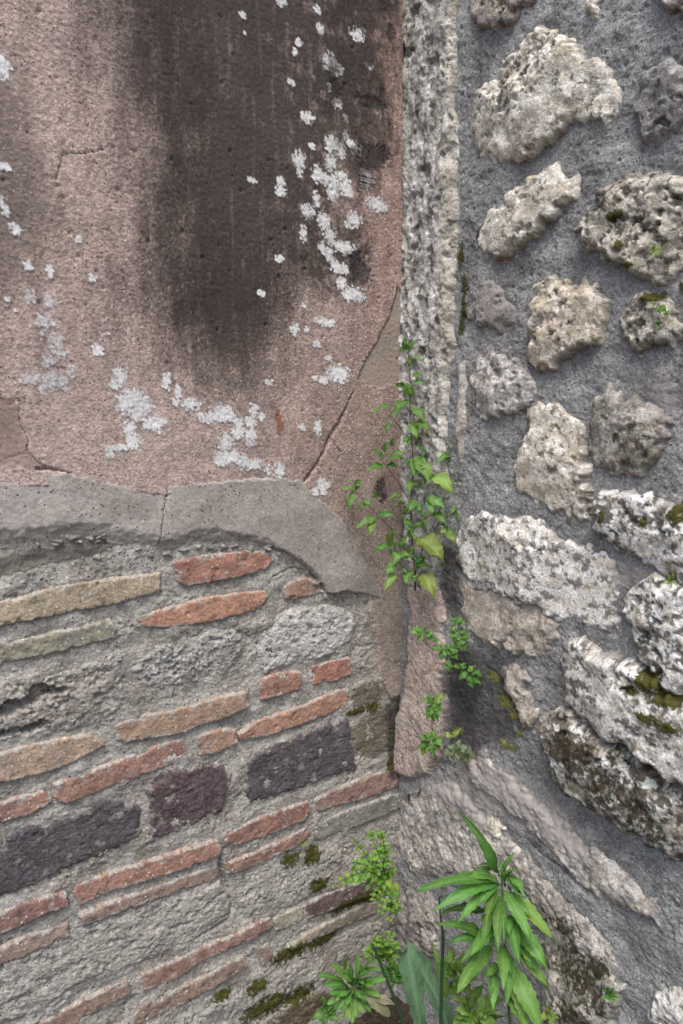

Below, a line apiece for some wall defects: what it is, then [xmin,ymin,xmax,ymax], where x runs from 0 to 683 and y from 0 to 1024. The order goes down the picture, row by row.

leakage [96,0,401,479]
leakage [312,477,331,496]